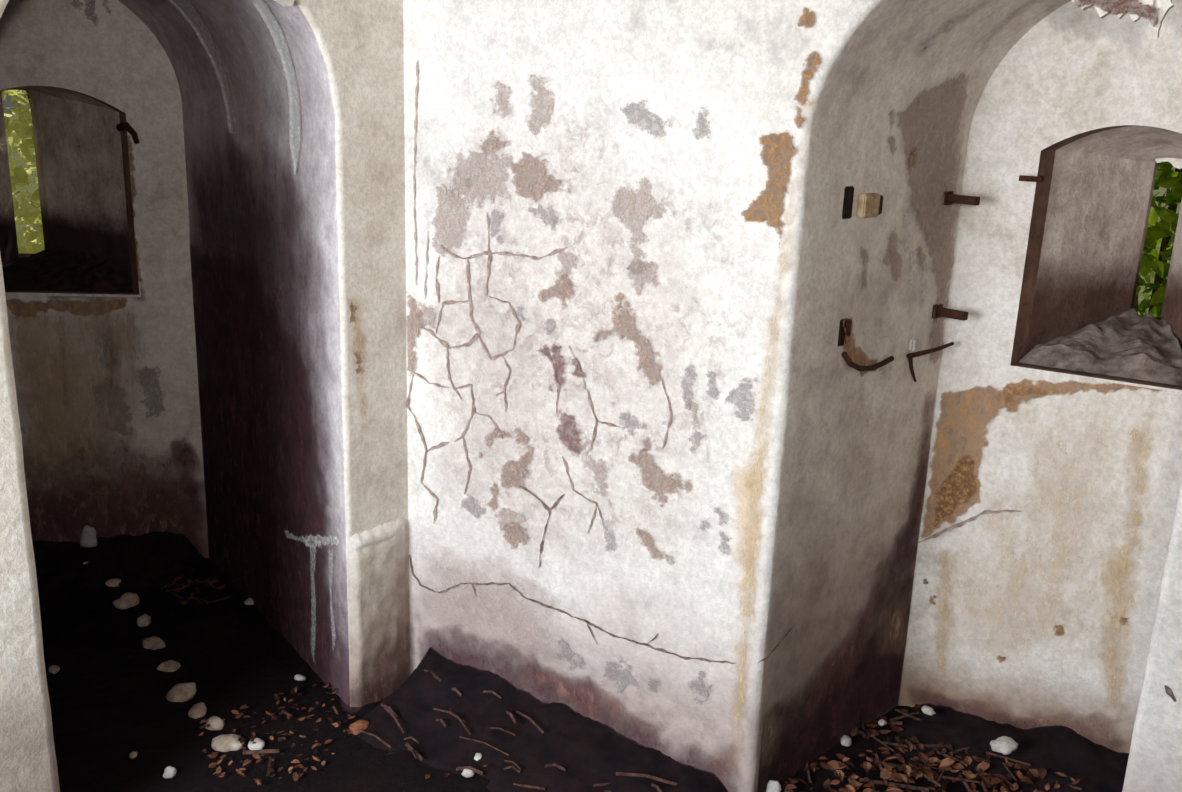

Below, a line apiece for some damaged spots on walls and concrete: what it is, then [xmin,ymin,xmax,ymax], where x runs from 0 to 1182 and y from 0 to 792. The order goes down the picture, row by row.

flaking render [1072,0,1174,38]
spalling [432,130,570,254]
spalling [741,51,821,238]
spalling [461,427,532,548]
crack [406,61,619,521]
crack [520,456,604,568]
spalling [541,319,585,391]
spalling [593,178,664,388]
crack [662,380,672,449]
rust [843,318,877,376]
spalling [921,386,1045,538]
crack [409,554,796,664]